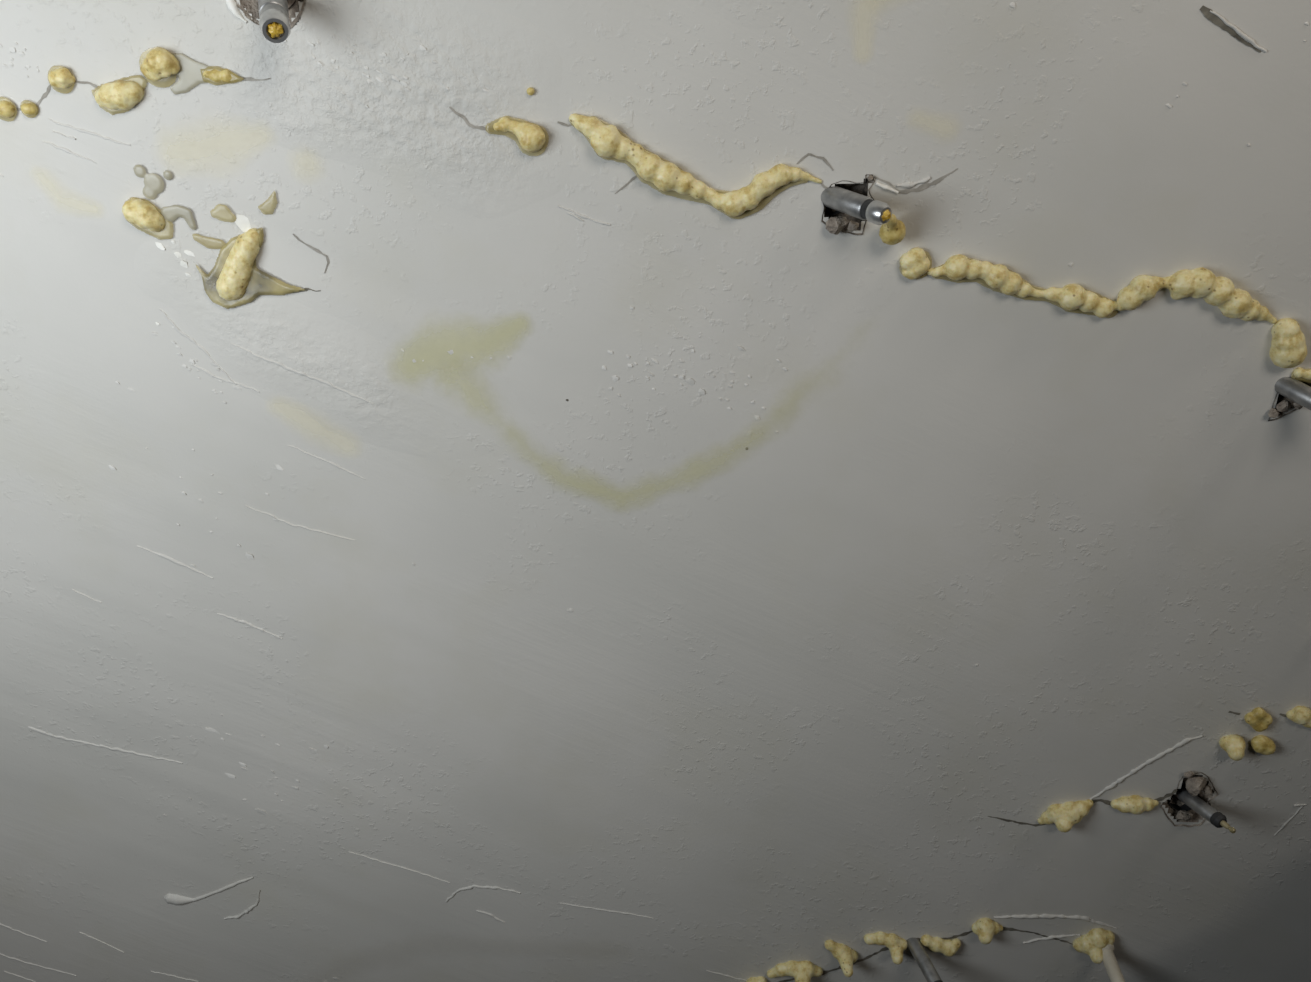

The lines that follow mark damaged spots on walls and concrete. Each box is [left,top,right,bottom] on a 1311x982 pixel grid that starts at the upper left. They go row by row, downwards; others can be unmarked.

crack [240,74,270,82]
crack [16,81,98,111]
crack [449,107,486,130]
crack [615,176,637,194]
crack [796,153,833,189]
crack [874,168,958,194]
crack [293,234,329,293]
crack [1092,798,1111,806]
crack [988,816,1046,827]
crack [779,927,1071,982]